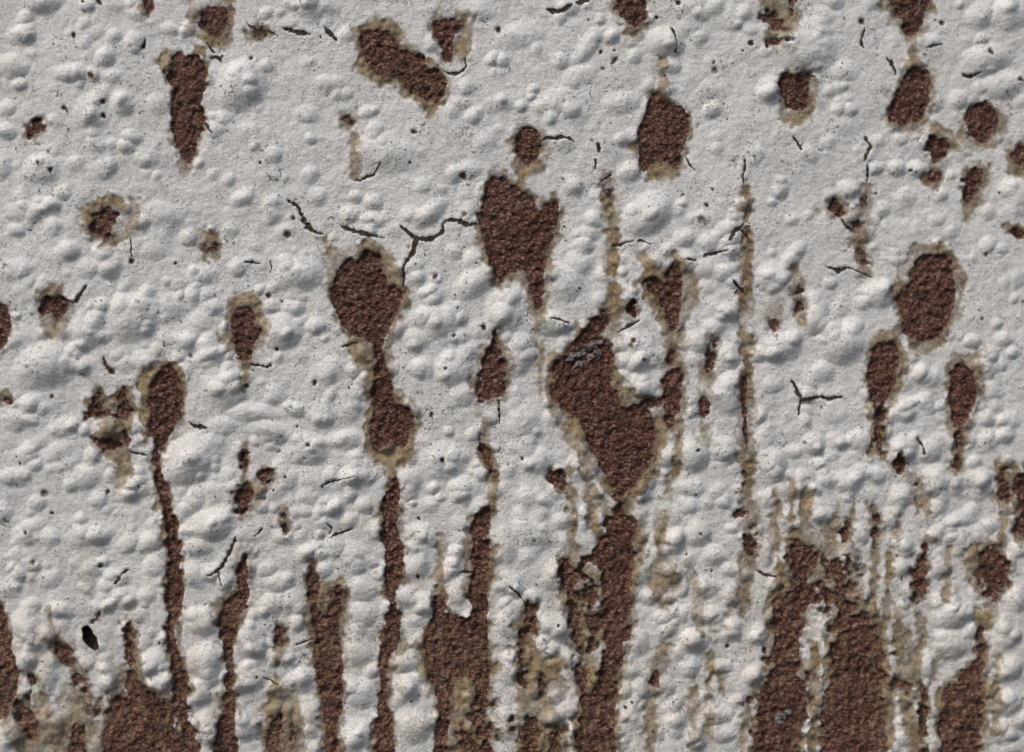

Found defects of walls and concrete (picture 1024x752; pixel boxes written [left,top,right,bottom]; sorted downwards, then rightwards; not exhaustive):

crack [287,200,478,287]
crack [791,380,843,416]